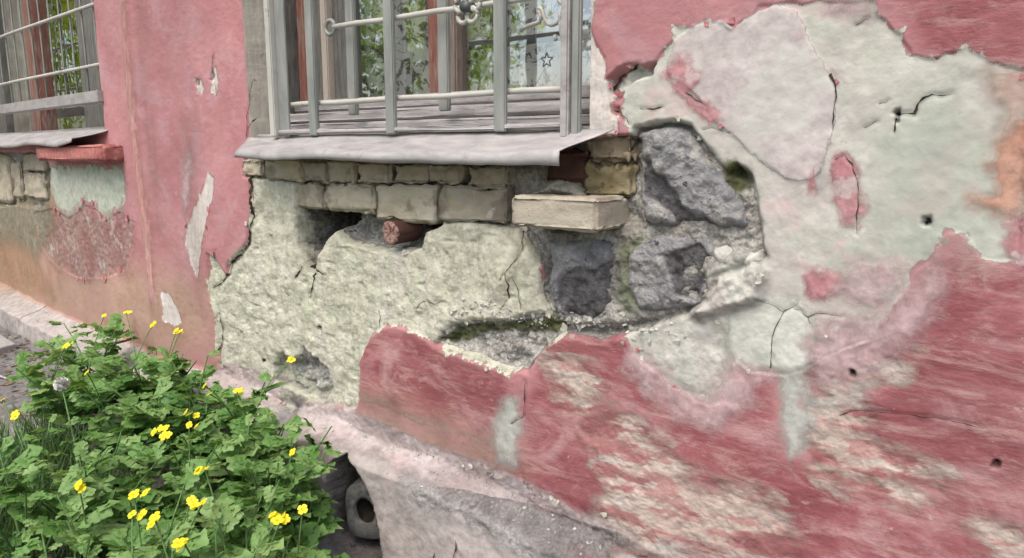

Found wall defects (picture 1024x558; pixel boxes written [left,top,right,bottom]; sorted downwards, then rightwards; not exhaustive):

peeling [194,66,218,95]
crack [829,73,837,128]
crack [864,94,951,132]
peeling [0,152,126,223]
peeling [180,152,214,278]
crack [835,155,859,229]
crack [500,231,524,310]
peeling [590,0,1024,515]
peeling [160,291,182,326]
peeling [196,122,800,558]
crack [758,300,842,369]
crack [839,410,984,429]